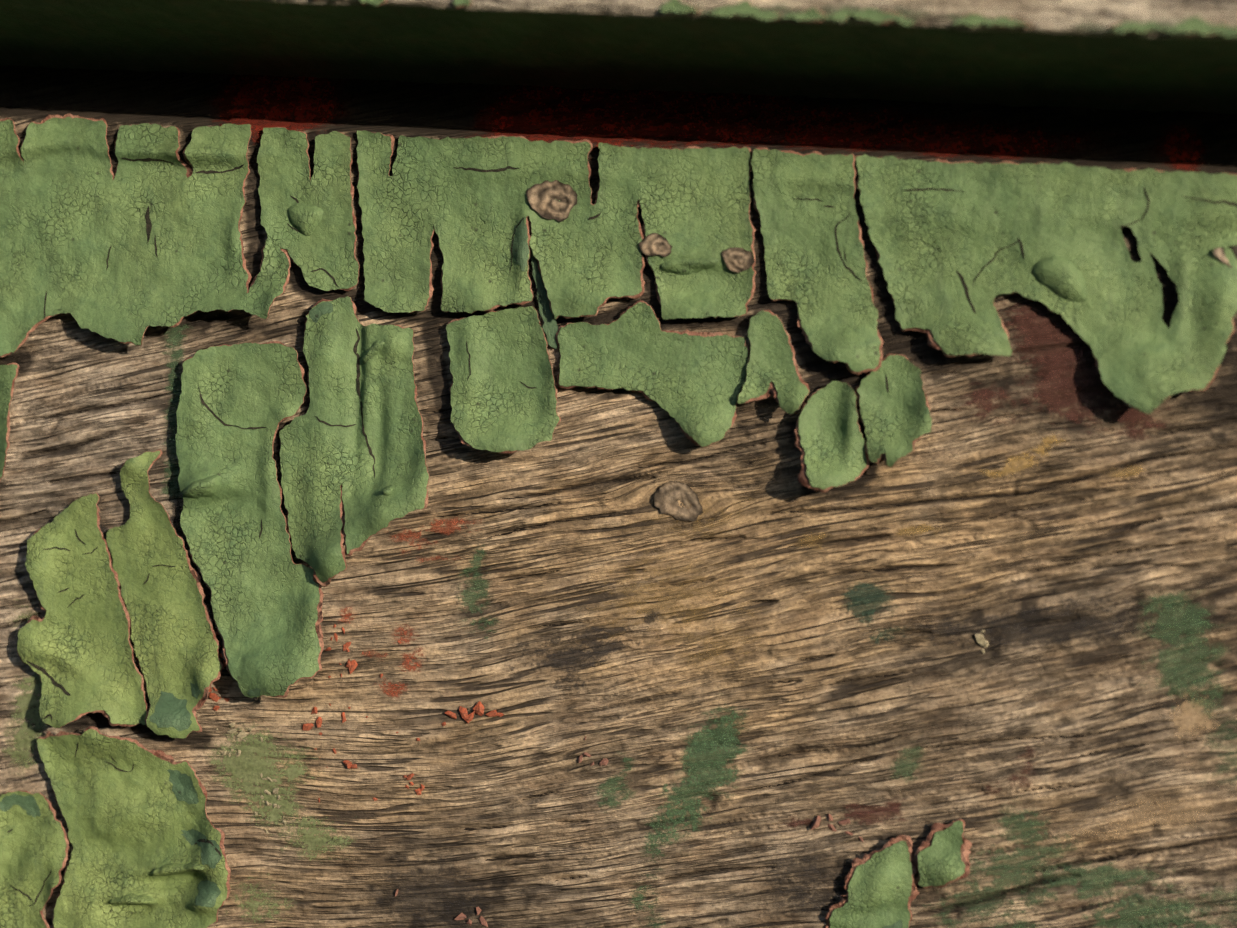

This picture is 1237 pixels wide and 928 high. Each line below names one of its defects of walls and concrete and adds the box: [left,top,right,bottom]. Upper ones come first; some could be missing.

peeling [953,12,1032,29]
peeling [0,113,1237,493]
crack [314,329,375,478]
peeling [0,296,429,928]
peeling [825,819,972,928]